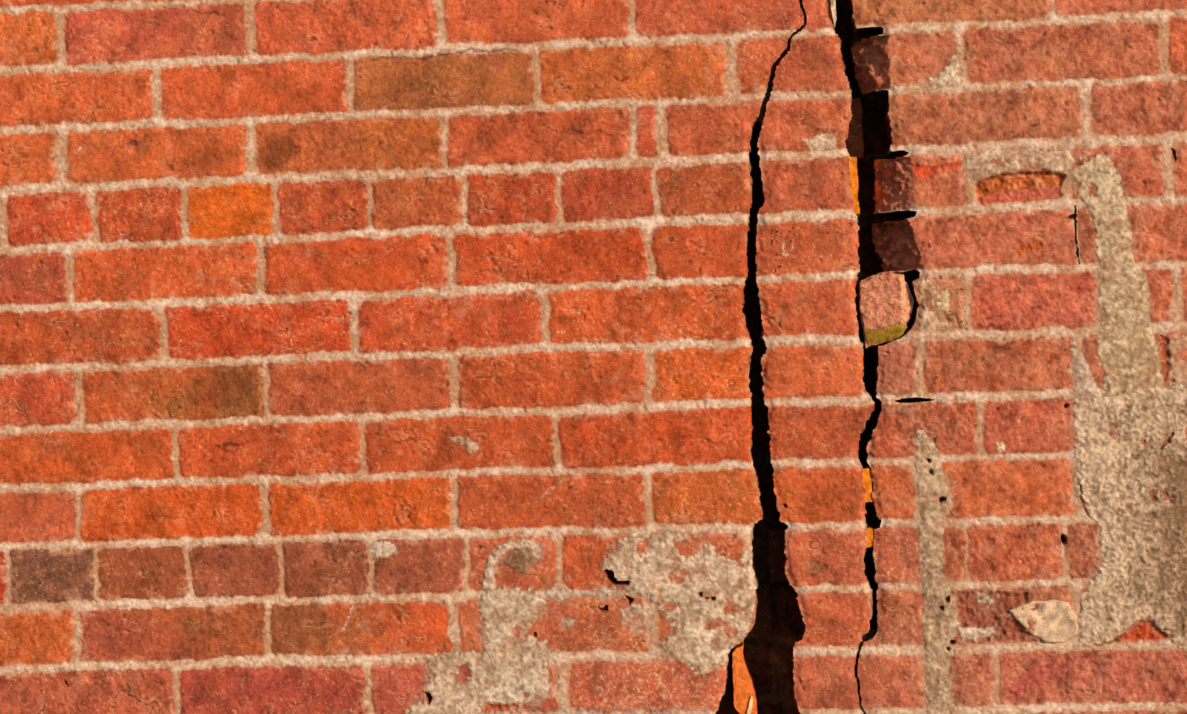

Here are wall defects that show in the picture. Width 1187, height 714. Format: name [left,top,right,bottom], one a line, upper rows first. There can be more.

spalling [975,154,1096,206]
crack [715,0,935,714]
peeling [1063,338,1101,409]
spalling [1160,336,1171,381]
peeling [545,569,652,635]
spalling [1121,620,1171,643]
spalling [480,702,538,713]